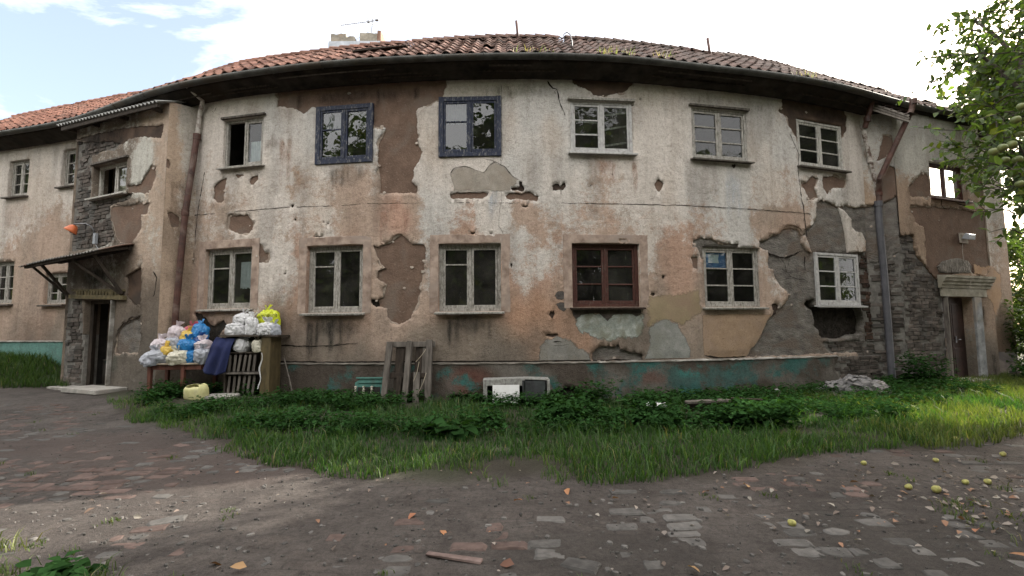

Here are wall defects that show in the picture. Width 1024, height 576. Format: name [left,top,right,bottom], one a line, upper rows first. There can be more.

flaking render [275,81,447,196]
flaking render [778,100,847,143]
flaking render [72,124,170,251]
flaking render [210,175,258,203]
flaking render [506,182,539,208]
flaking render [227,212,255,236]
flaking render [372,234,427,325]
flaking render [747,134,1002,380]
peeling [575,313,644,361]